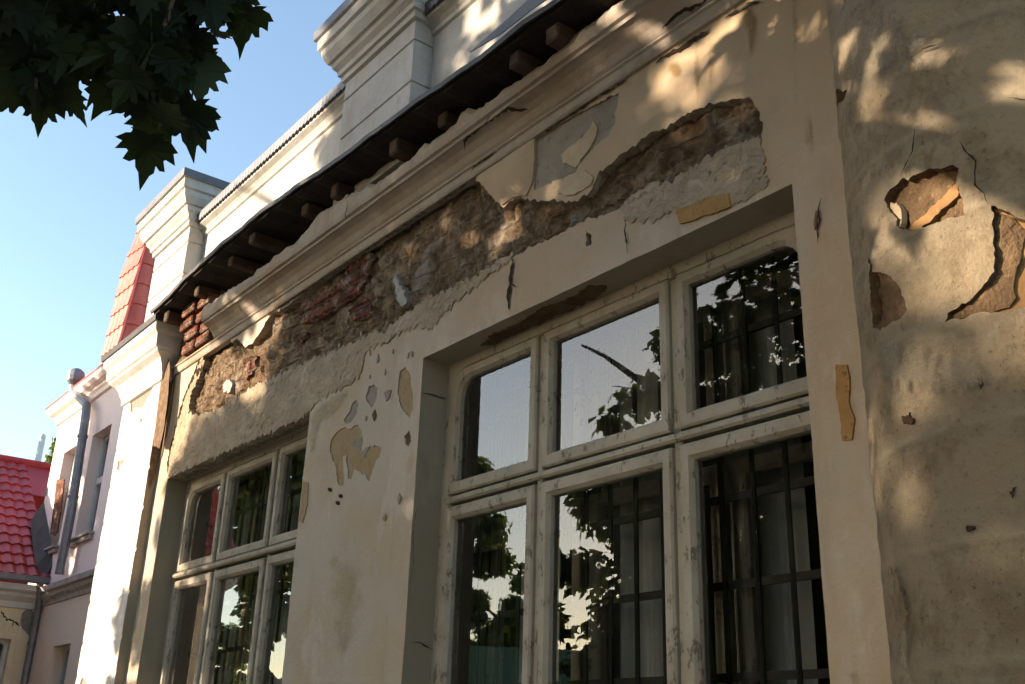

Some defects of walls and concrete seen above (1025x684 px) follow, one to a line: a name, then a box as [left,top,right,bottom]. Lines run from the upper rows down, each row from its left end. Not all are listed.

crack [541,80,626,134]
crack [269,107,528,316]
spalling [890,128,964,230]
spalling [953,142,1025,319]
spalling [168,95,770,505]
spalling [878,272,907,328]
peeling [835,364,856,441]